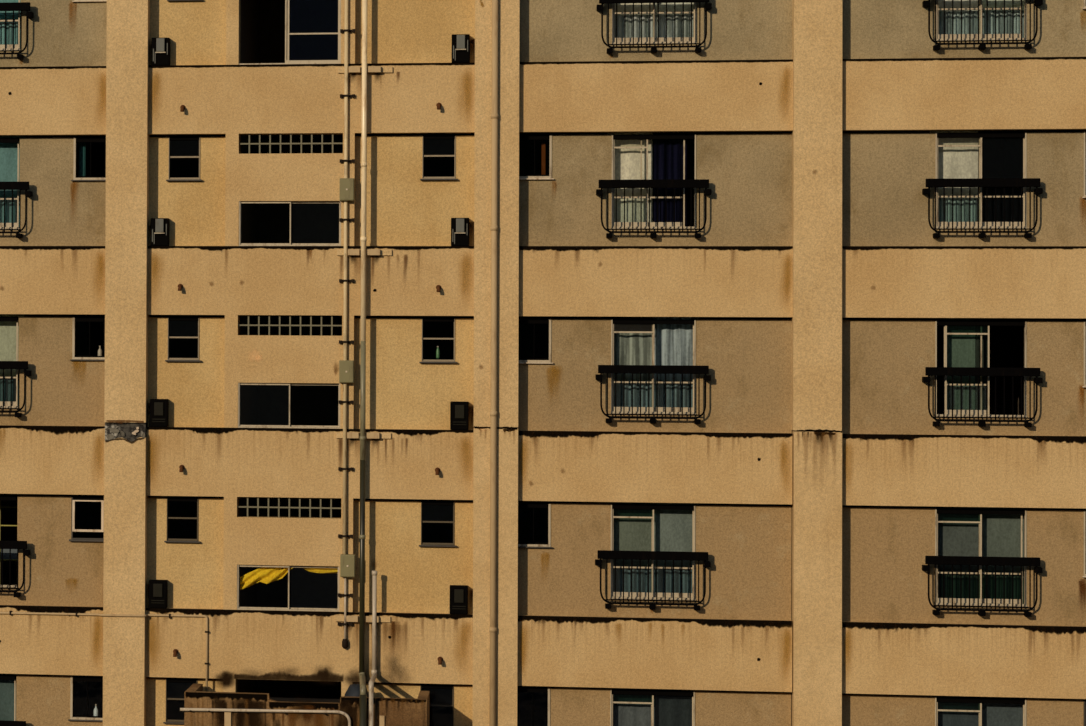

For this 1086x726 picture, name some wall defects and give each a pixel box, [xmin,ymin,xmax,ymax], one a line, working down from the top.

water stain [0,425,105,435]
spalling [105,420,146,443]
water stain [147,427,473,455]
water stain [842,434,1086,444]
water stain [518,615,792,628]